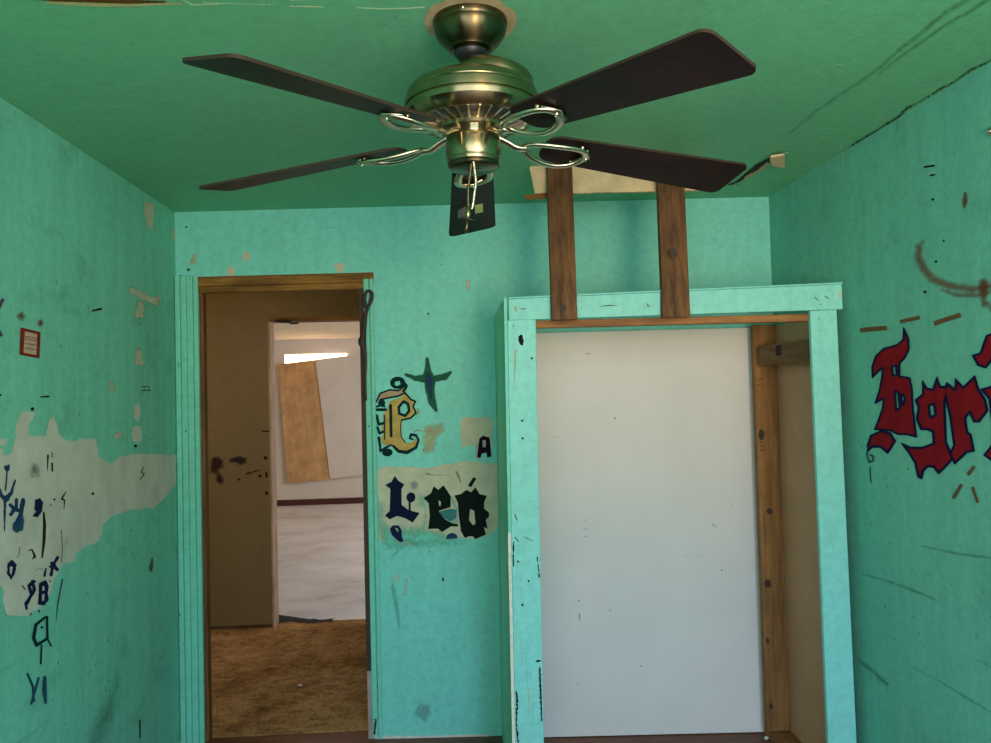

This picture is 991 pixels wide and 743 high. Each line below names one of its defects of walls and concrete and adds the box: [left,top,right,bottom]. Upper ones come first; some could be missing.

crack [43,0,323,8]
crack [356,3,425,11]
peeling [144,202,154,232]
peeling [414,424,443,452]
peeling [460,417,493,447]
peeling [0,404,177,616]
peeling [377,461,498,547]